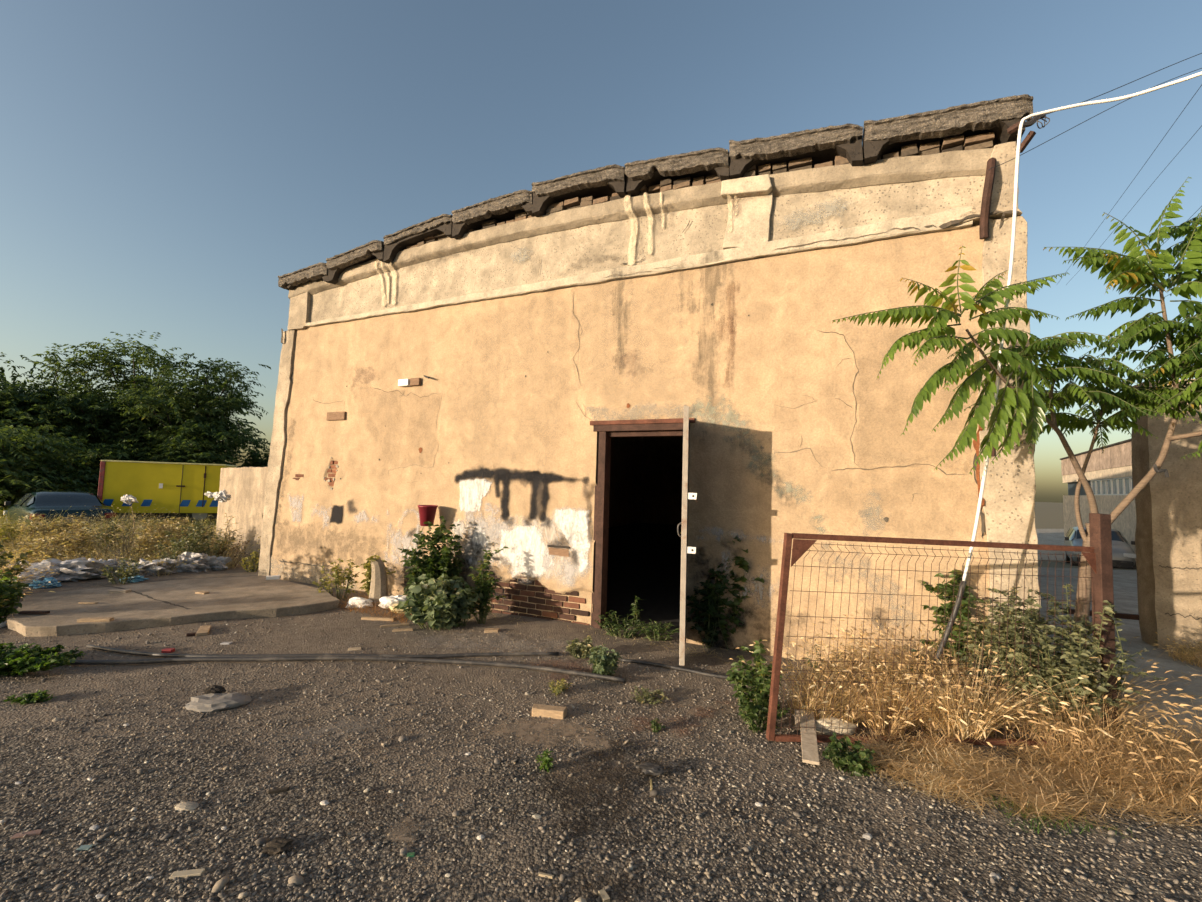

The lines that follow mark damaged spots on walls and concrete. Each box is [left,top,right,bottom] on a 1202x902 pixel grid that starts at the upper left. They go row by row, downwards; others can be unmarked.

crack [776,329,985,538]
flaking render [491,576,590,625]